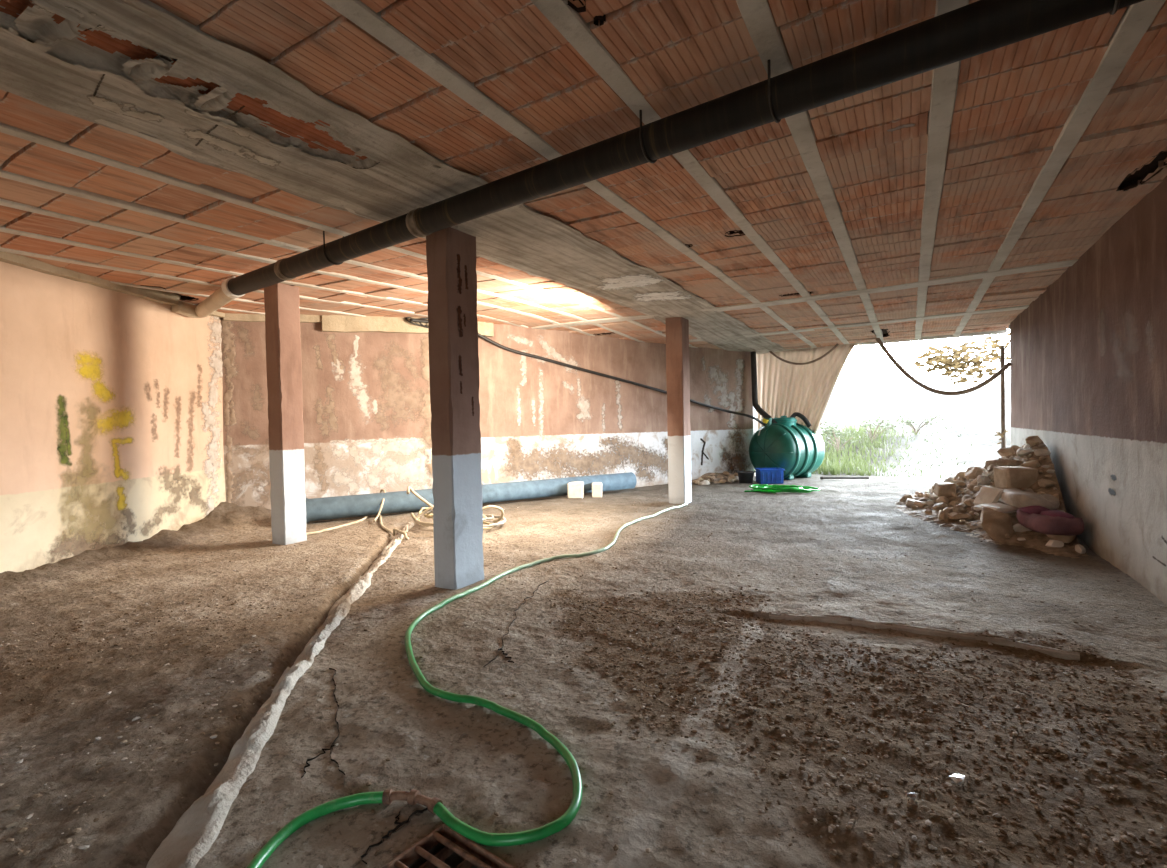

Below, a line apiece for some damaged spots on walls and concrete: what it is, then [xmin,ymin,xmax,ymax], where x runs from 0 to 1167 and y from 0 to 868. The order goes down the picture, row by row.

spalling [0,0,379,168]
leakage [62,406,117,546]
peeling [314,334,431,494]
peeling [503,437,668,480]
crack [483,578,550,667]
crack [301,668,345,781]